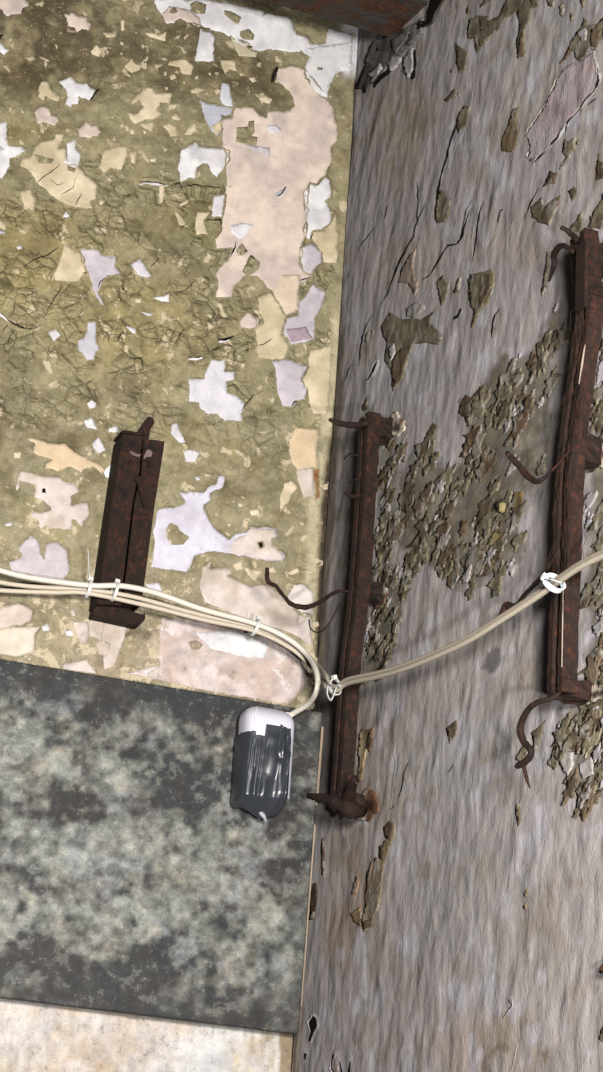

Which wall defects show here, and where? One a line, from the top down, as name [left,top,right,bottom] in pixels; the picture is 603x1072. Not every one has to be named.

peeling [450,0,603,74]
crack [37,165,82,203]
crack [137,177,170,186]
peeling [530,136,581,226]
peeling [569,194,603,233]
crack [0,287,62,342]
crack [175,329,233,360]
peeling [0,0,445,705]
peeling [365,249,495,391]
peeling [359,302,571,688]
peeling [515,338,603,822]
peeling [350,727,396,932]